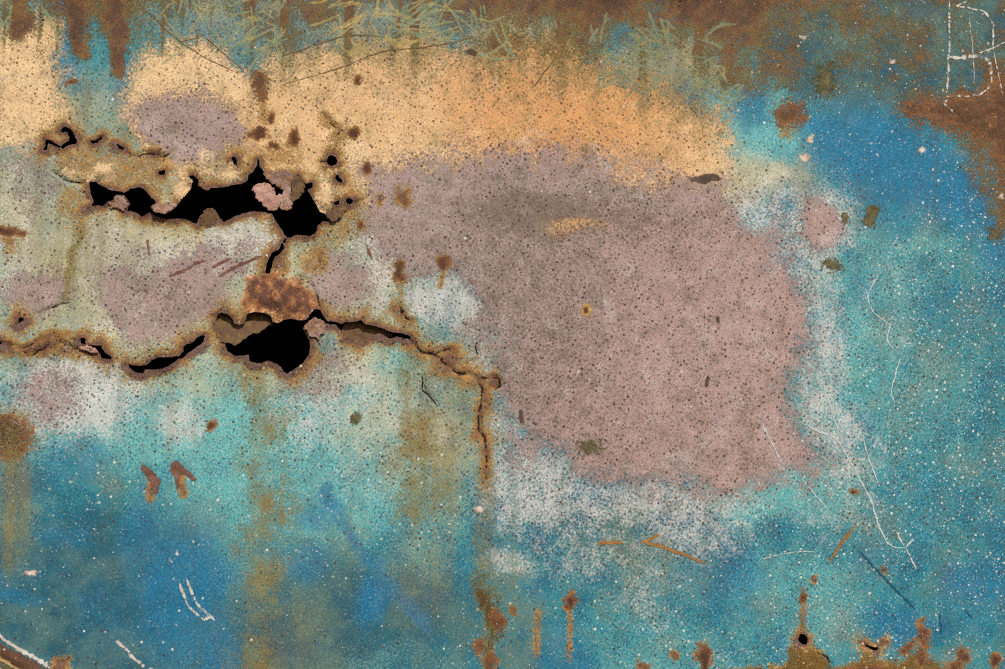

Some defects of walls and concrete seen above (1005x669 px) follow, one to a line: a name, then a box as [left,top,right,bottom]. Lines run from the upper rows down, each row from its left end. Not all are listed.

corrosion [0,0,1005,243]
corrosion [0,225,30,261]
peeling [0,262,79,320]
corrosion [240,269,318,323]
peeling [87,22,848,515]
peeling [7,361,89,430]
crack [387,297,505,493]
corrosion [0,403,42,476]
corrosion [466,468,518,669]
corrosion [560,588,578,662]
corrosion [669,641,715,669]
corrosion [734,573,972,669]